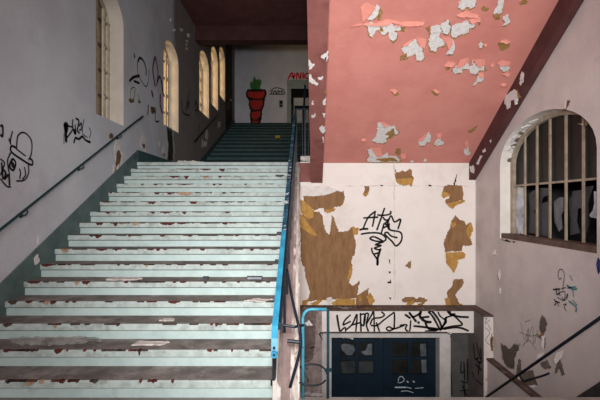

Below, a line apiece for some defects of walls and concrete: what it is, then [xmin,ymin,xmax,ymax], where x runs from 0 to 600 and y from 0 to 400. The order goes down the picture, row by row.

peeling [351,0,511,87]
peeling [366,122,414,187]
peeling [101,169,256,214]
peeling [441,174,473,305]
peeling [300,185,380,363]
peeling [5,378,80,386]
peeling [83,341,170,356]
spalling [536,332,565,376]